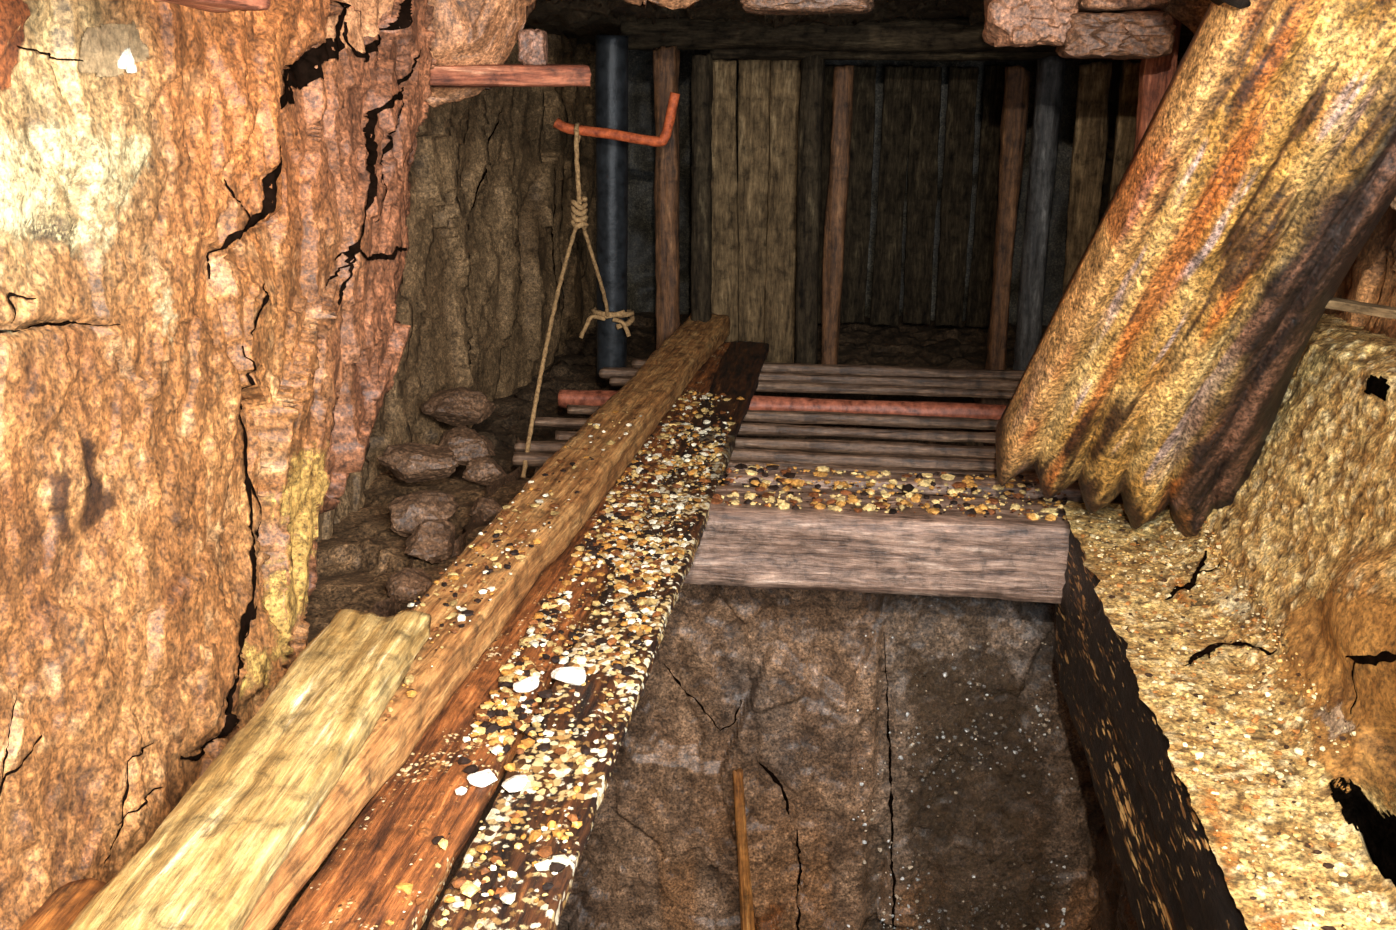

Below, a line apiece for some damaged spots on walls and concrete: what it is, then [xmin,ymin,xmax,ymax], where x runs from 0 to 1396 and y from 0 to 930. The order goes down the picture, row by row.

crack [280,0,421,305]
crack [206,145,282,279]
crack [0,292,121,333]
crack [104,284,270,864]
crack [1165,550,1220,600]
crack [1184,641,1277,666]
crack [1345,651,1396,714]